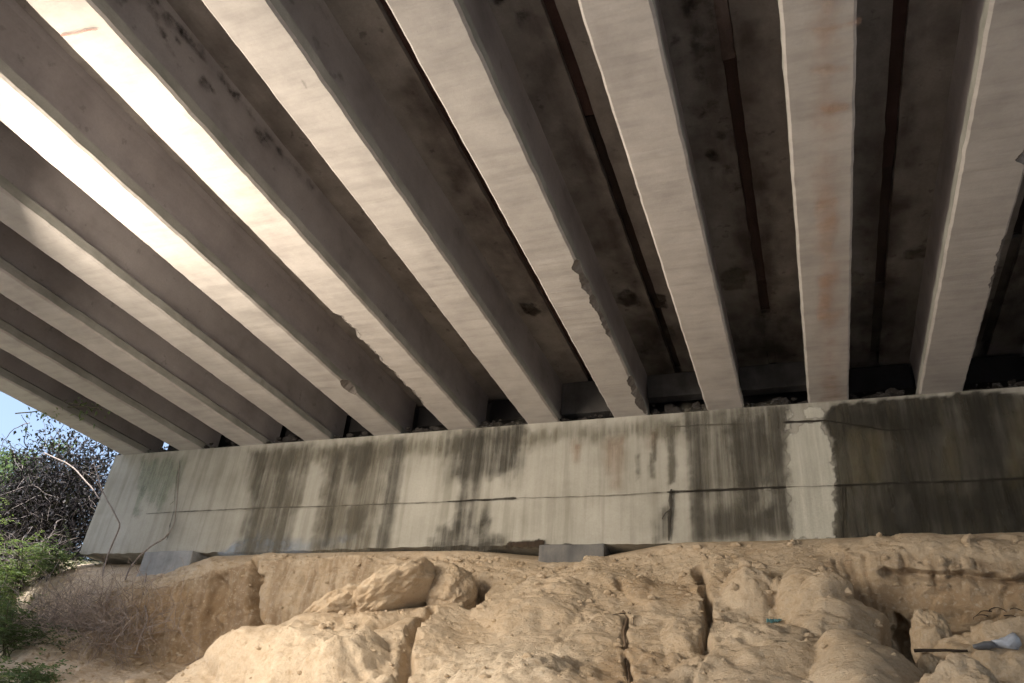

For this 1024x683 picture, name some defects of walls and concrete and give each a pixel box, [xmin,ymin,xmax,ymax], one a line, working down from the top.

spalling [572,259,611,336]
spalling [627,375,647,414]
crack [148,471,389,538]
leakage [226,440,411,554]
leakage [425,426,557,551]
crack [417,486,792,541]
leakage [636,425,679,484]
leakage [685,407,789,541]
leakage [823,392,1024,538]
crack [827,477,1024,538]